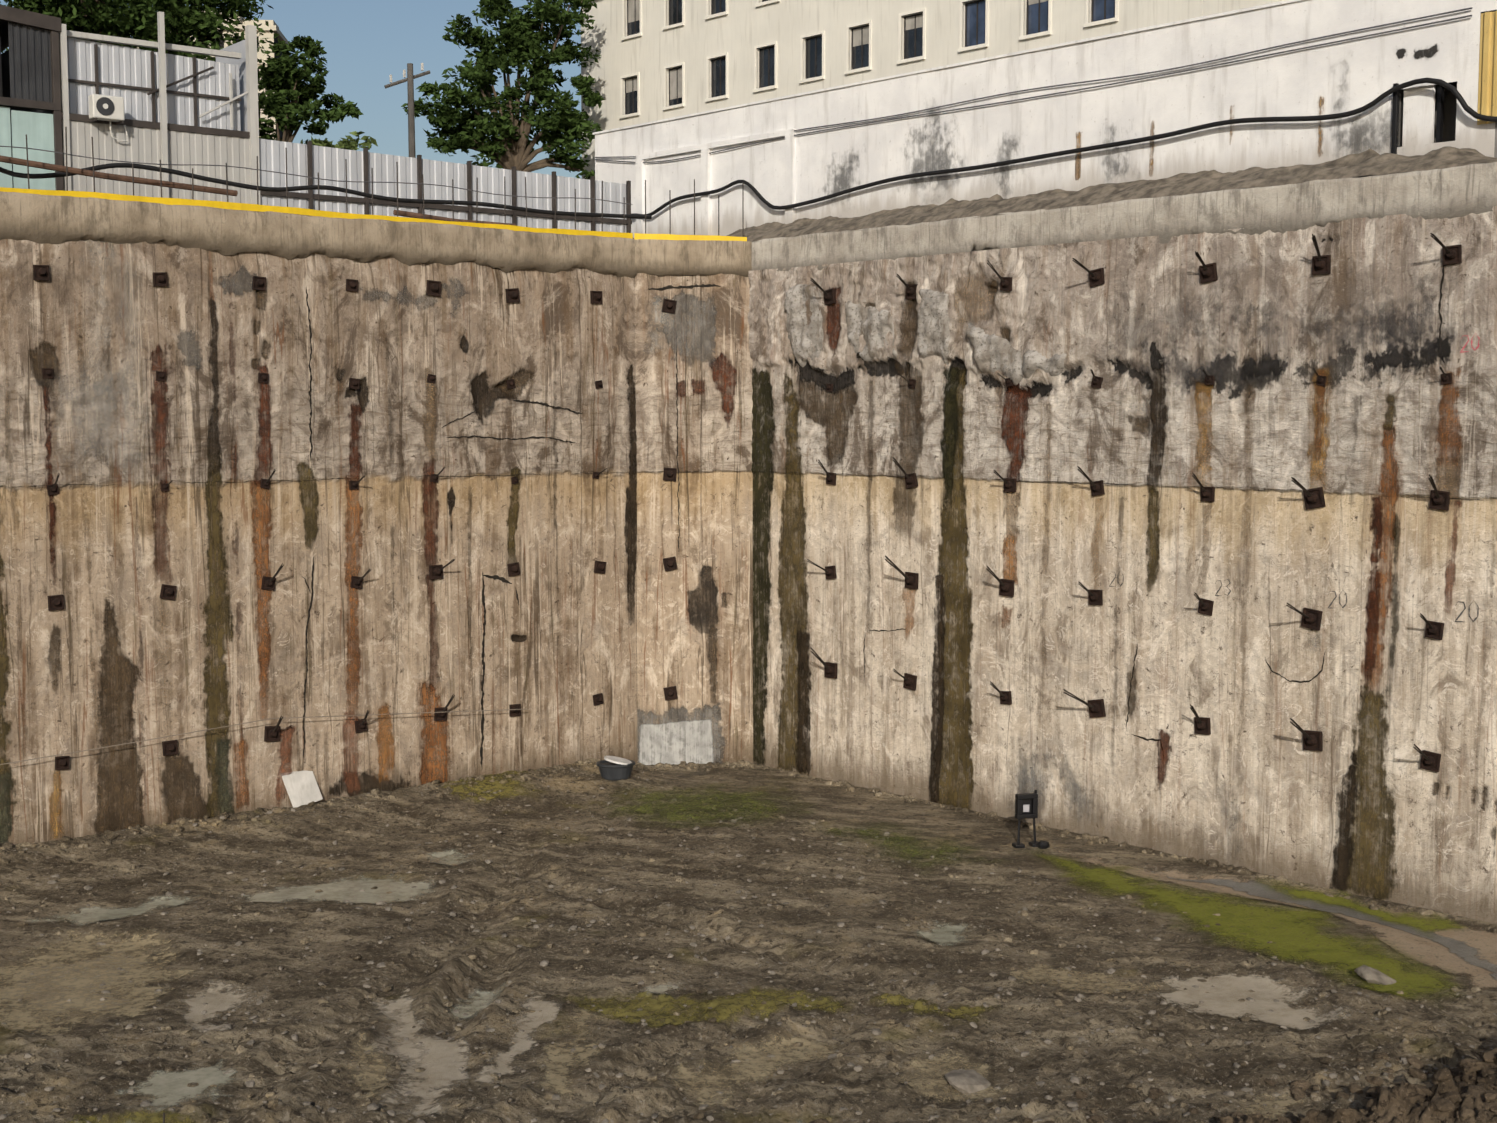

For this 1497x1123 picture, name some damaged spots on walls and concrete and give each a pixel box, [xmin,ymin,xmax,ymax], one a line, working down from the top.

damp [0,555,17,843]
damp [94,599,145,834]
damp [161,298,241,823]
corrosion [343,404,363,791]
corrosion [377,706,395,781]
corrosion [419,368,450,785]
corrosion [676,353,737,427]
damp [751,358,861,775]
damp [893,362,976,810]
damp [1142,331,1449,591]
corrosion [1332,394,1400,900]